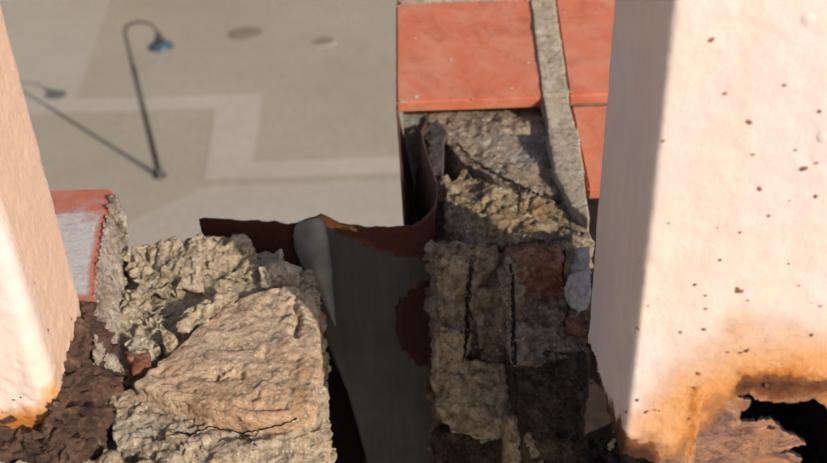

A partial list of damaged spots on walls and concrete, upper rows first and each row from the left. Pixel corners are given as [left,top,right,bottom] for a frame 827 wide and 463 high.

corrosion [0,5,81,430]
corrosion [199,210,435,265]
corrosion [395,281,432,370]
corrosion [597,329,827,463]
spalling [740,407,824,463]